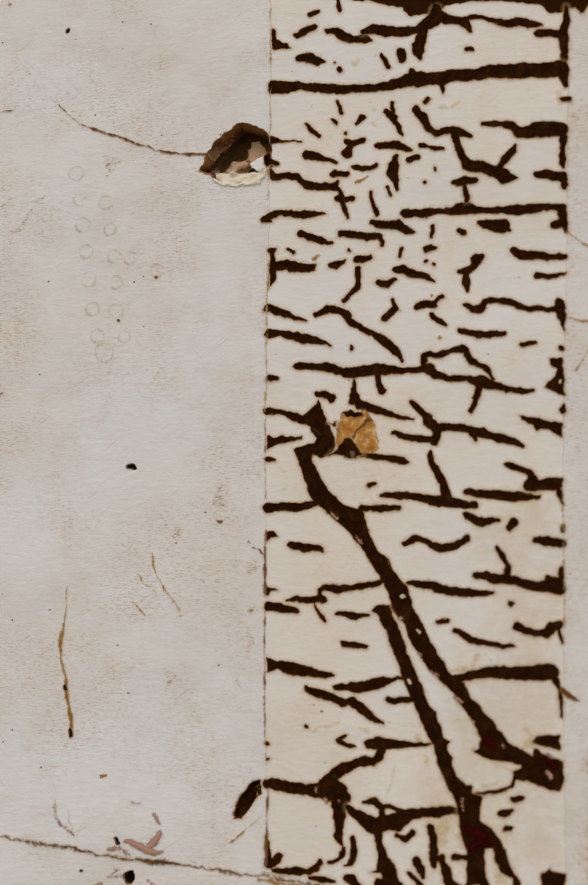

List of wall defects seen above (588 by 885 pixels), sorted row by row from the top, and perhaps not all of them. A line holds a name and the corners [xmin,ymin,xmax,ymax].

crack [59,104,207,156]
crack [262,265,270,451]
peeling [199,0,588,885]
crack [248,530,267,745]
crack [1,791,319,885]